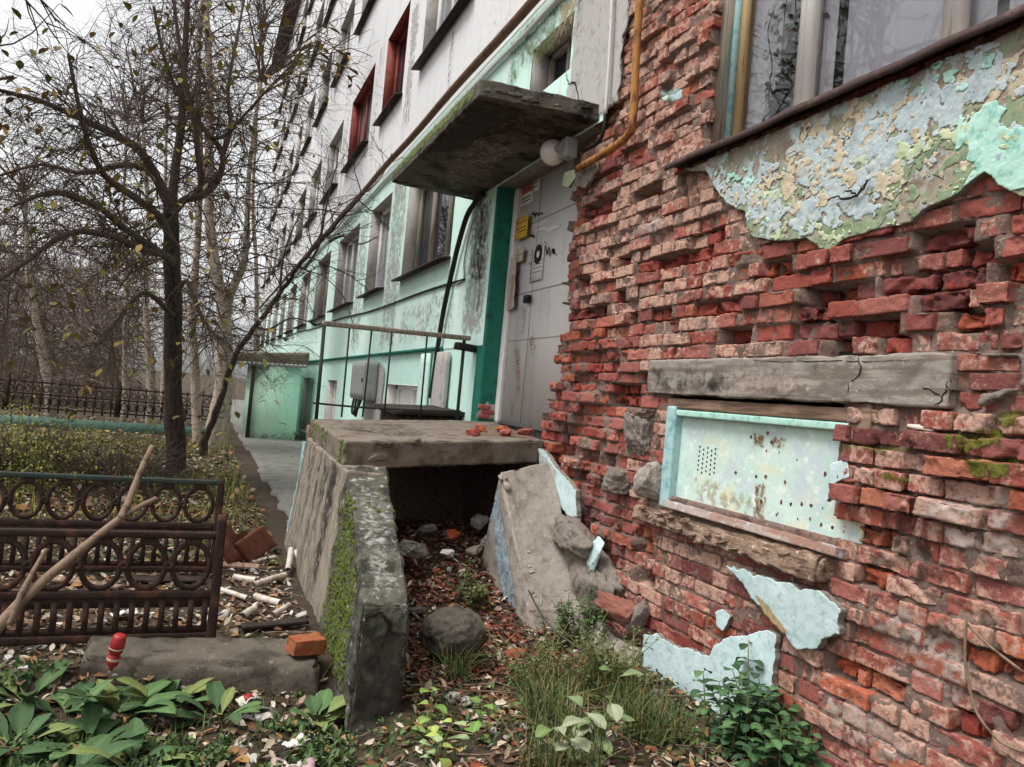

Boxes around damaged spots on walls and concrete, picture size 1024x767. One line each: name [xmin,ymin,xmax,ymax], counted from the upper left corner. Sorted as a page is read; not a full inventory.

peeling [685,24,1024,250]
crack [827,178,871,202]
crack [759,358,908,392]
crack [922,380,960,405]
rust [750,431,786,453]
rust [754,475,834,529]
spalling [594,591,635,628]